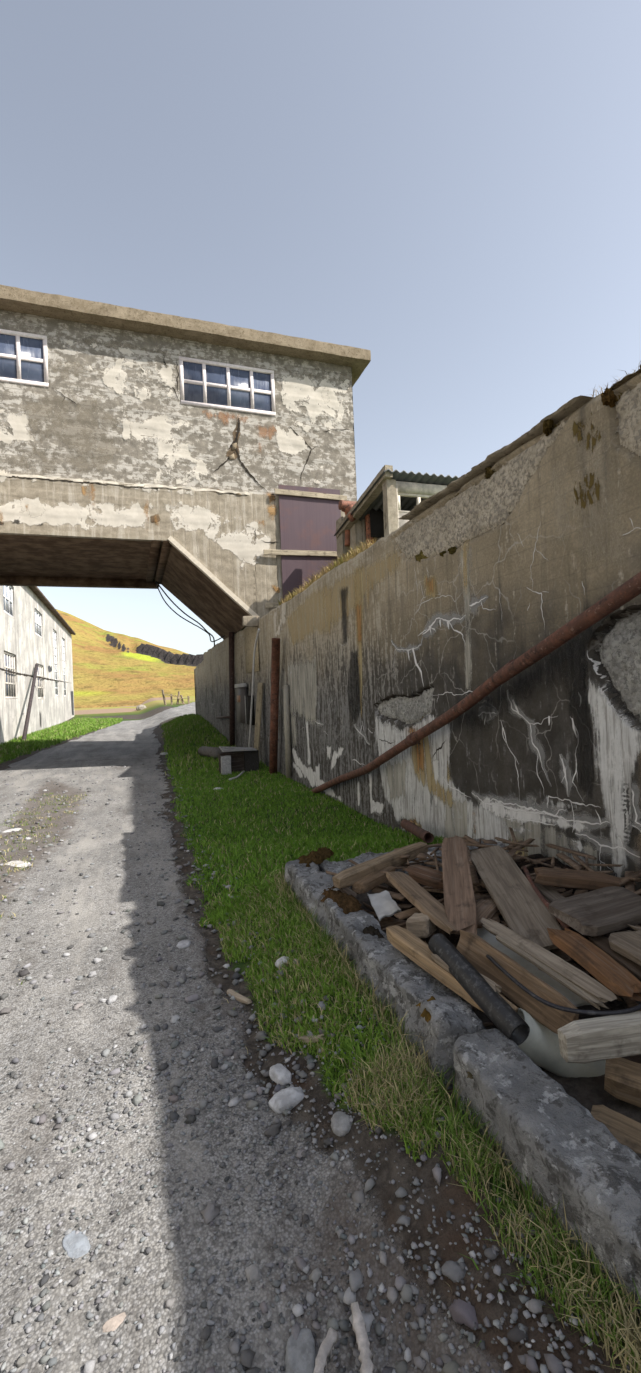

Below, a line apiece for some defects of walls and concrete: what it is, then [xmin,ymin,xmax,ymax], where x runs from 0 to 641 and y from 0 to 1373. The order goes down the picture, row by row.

crack [6,476,180,491]
peeling [0,340,271,570]
crack [215,418,268,494]
peeling [271,375,350,462]
crack [289,426,352,475]
spalling [374,686,434,724]
water stain [281,568,641,888]
water stain [460,540,472,688]
crack [391,528,641,871]
spalling [587,605,641,723]